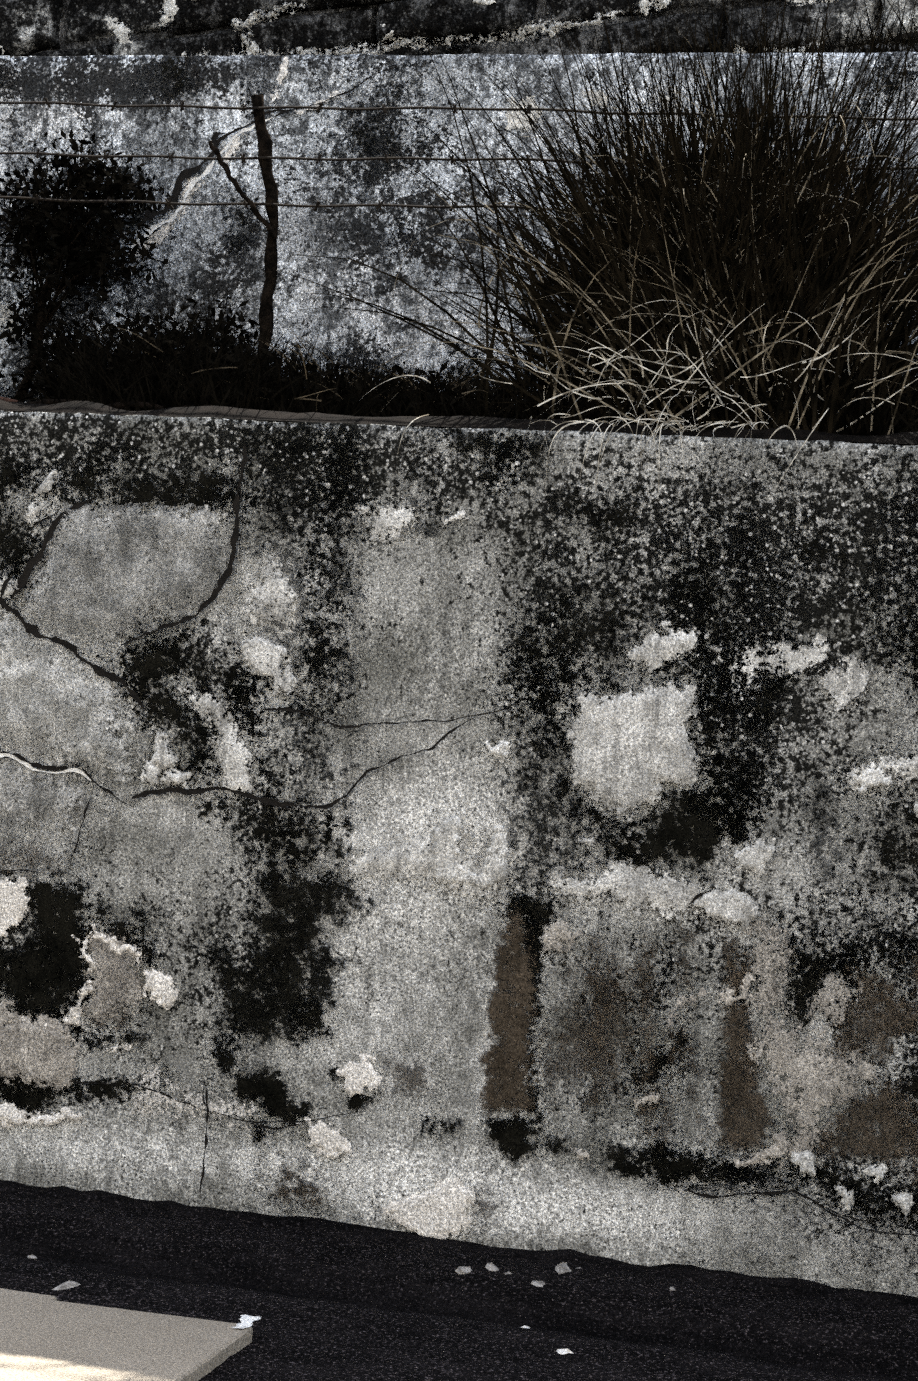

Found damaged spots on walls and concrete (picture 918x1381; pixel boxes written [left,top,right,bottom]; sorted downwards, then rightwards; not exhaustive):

crack [136,64,403,241]
crack [0,443,249,710]
water stain [0,420,375,1145]
crack [0,707,511,873]
water stain [479,450,918,1233]
water stain [274,1169,319,1205]
water stain [420,1112,463,1138]